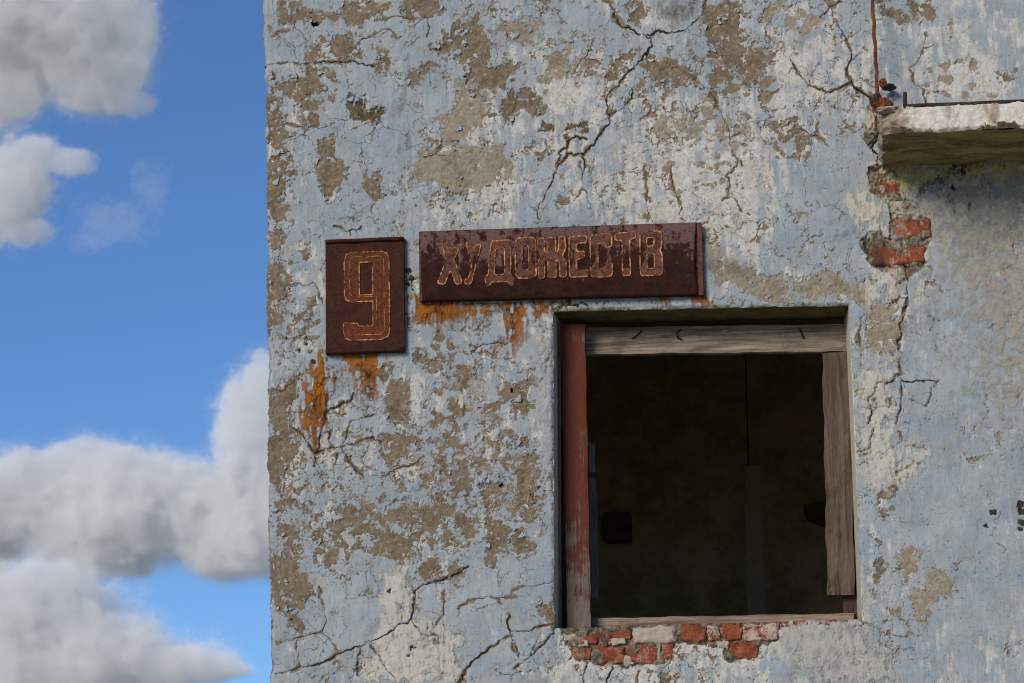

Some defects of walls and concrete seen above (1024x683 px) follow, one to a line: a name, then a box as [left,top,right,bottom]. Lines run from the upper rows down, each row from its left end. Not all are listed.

peeling [407,12,591,197]
crack [537,0,742,224]
crack [789,1,879,166]
rust [299,350,383,449]
peeling [267,330,544,634]
rust [410,295,555,355]
peeling [553,194,572,210]
spalling [709,167,933,360]
crack [862,279,939,454]
crack [275,567,554,682]
spalling [536,595,860,669]
peeling [869,531,958,625]